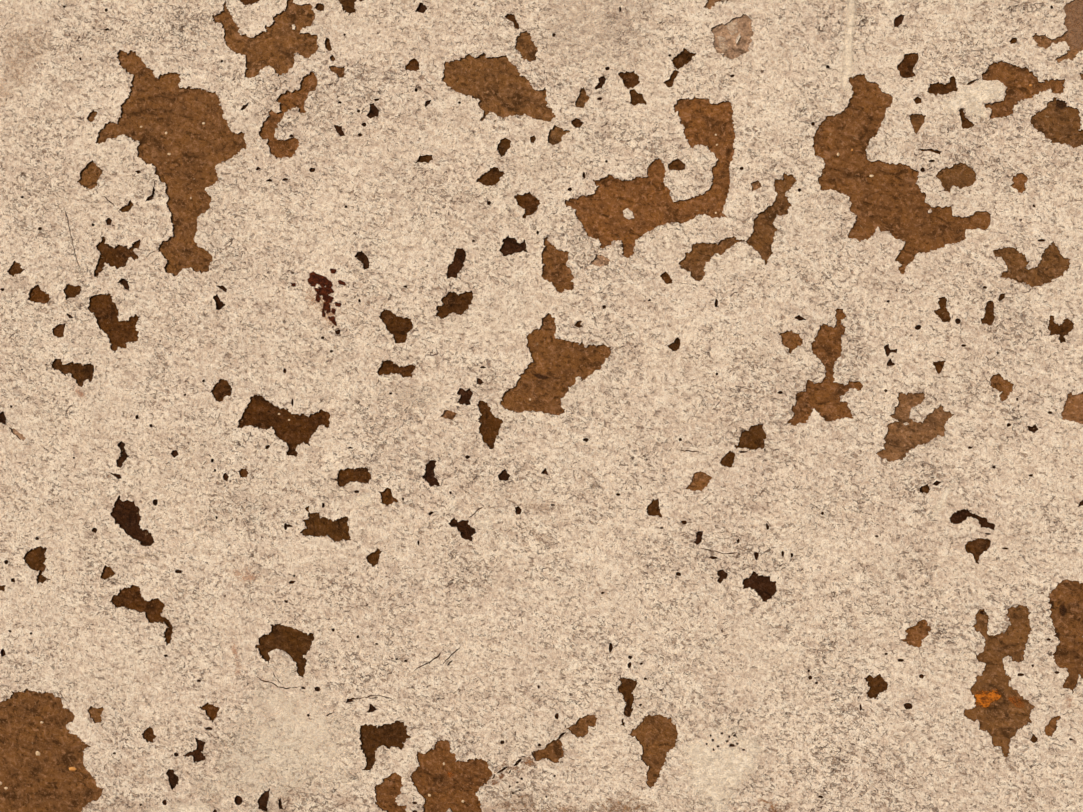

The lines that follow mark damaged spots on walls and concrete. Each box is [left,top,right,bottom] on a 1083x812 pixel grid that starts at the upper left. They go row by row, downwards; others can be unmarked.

peeling [212,0,345,78]
peeling [441,14,647,145]
peeling [87,50,247,276]
peeling [565,96,744,267]
peeling [813,74,991,274]
peeling [237,395,331,457]
peeling [440,313,611,449]
peeling [777,308,863,426]
peeling [0,688,104,812]
peeling [374,739,493,812]
rust [974,690,1024,708]
peeling [963,605,1061,757]